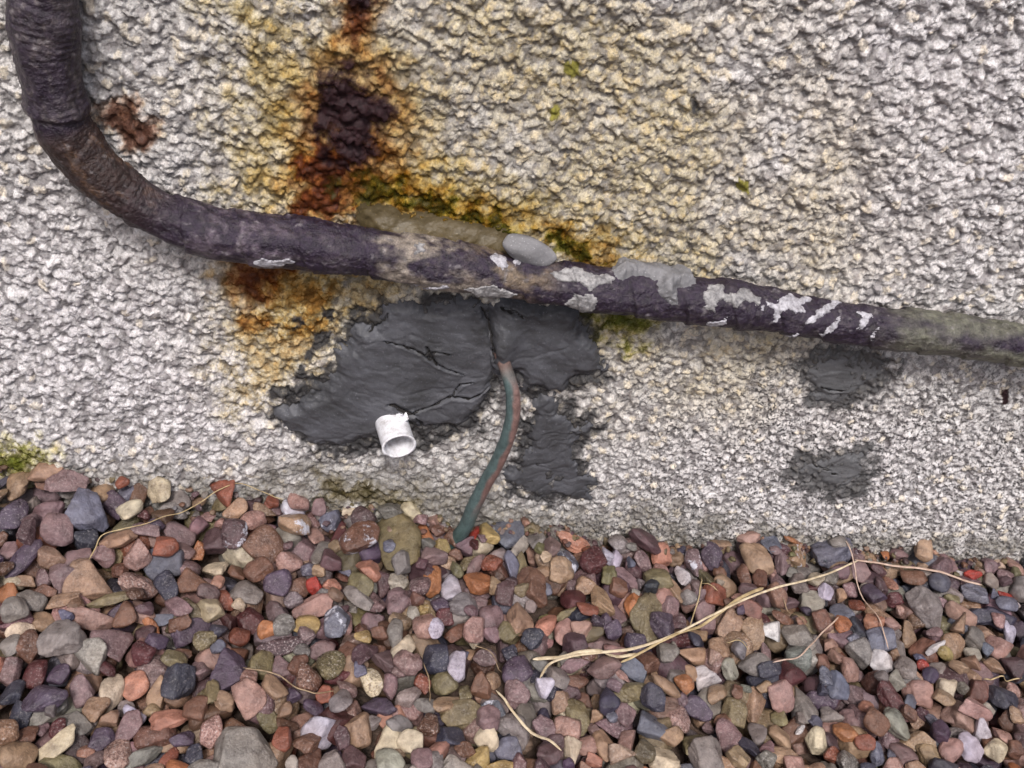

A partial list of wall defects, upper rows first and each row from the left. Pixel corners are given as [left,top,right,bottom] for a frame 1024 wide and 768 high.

corrosion [343,0,371,40]
corrosion [106,99,153,150]
corrosion [291,58,399,220]
corrosion [231,263,295,302]
crack [369,314,481,432]